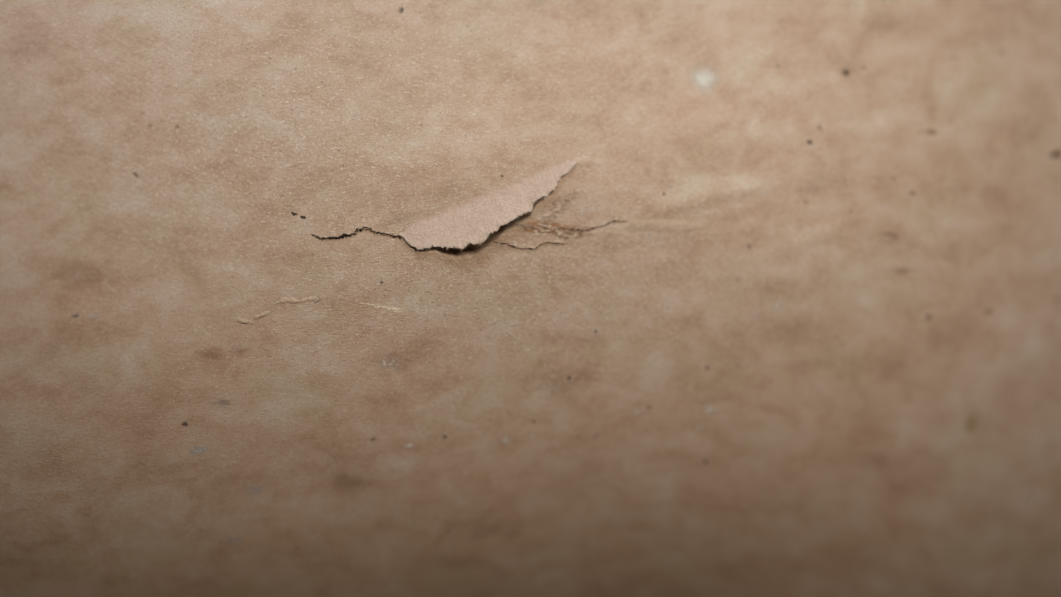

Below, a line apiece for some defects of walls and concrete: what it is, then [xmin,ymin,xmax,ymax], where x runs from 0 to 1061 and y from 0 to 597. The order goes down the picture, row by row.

crack [312,227,401,240]
peeling [492,229,570,249]
crack [494,221,627,250]